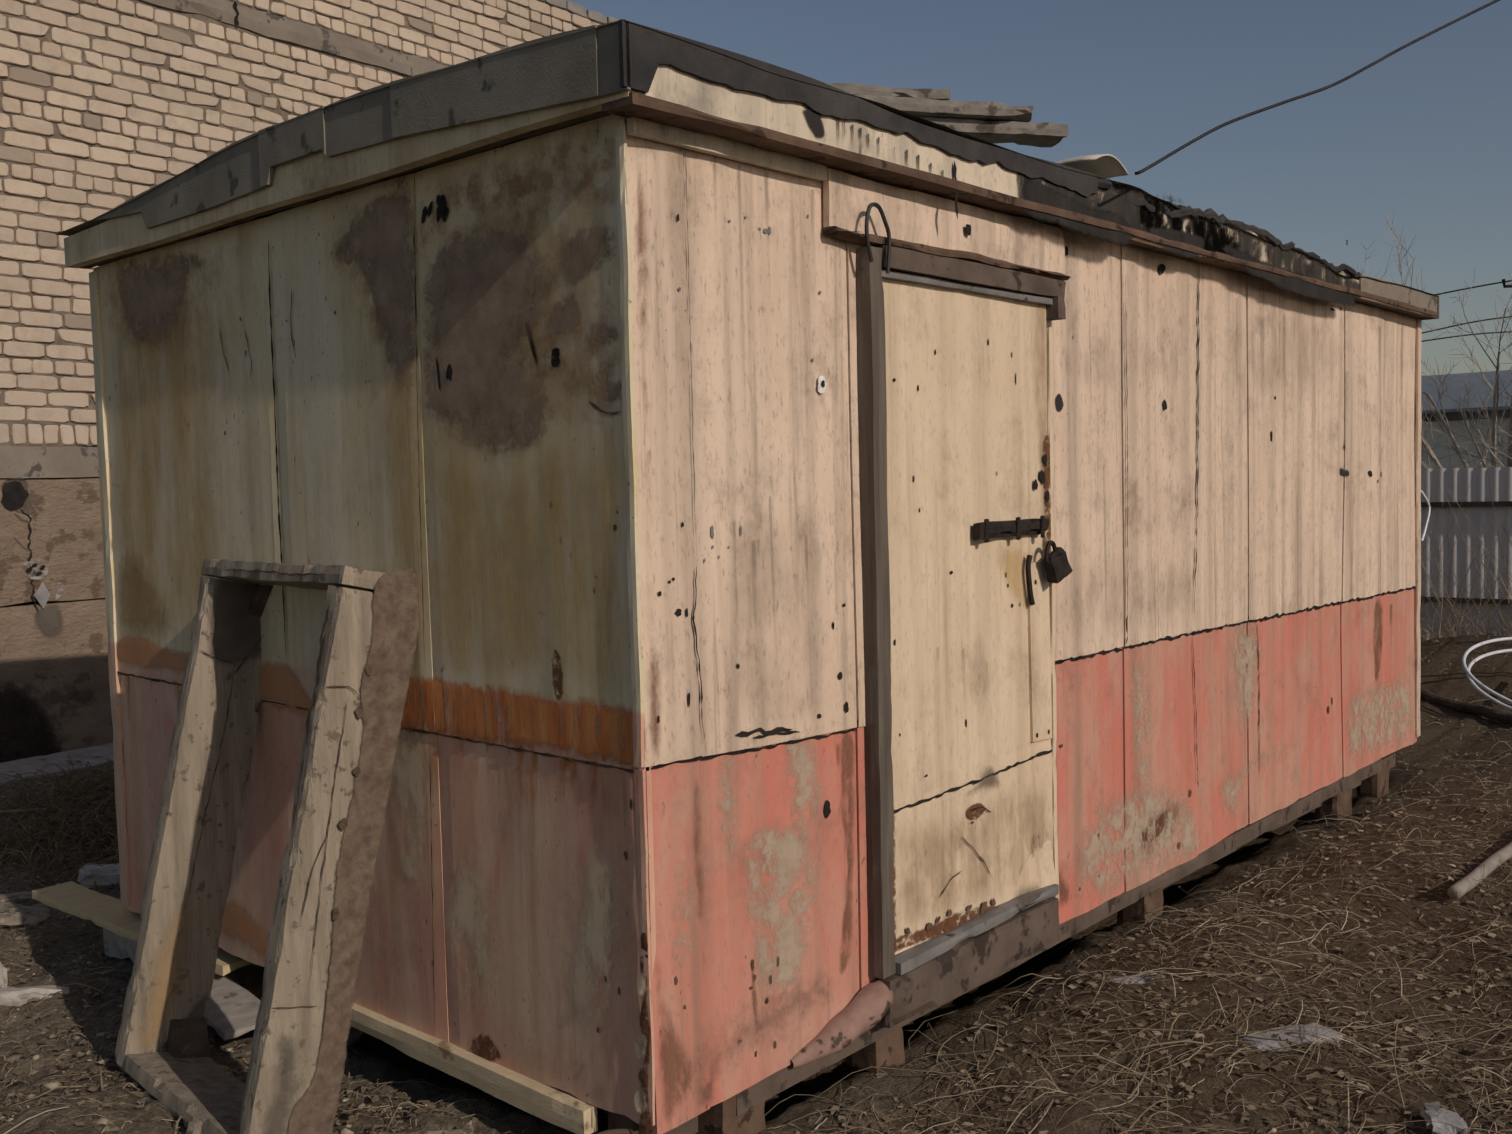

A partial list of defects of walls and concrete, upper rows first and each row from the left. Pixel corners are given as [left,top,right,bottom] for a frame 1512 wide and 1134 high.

water stain [337,179,414,385]
crack [13,509,41,613]
corrosion [116,564,189,707]
corrosion [400,652,658,798]
peeling [1082,665,1198,892]